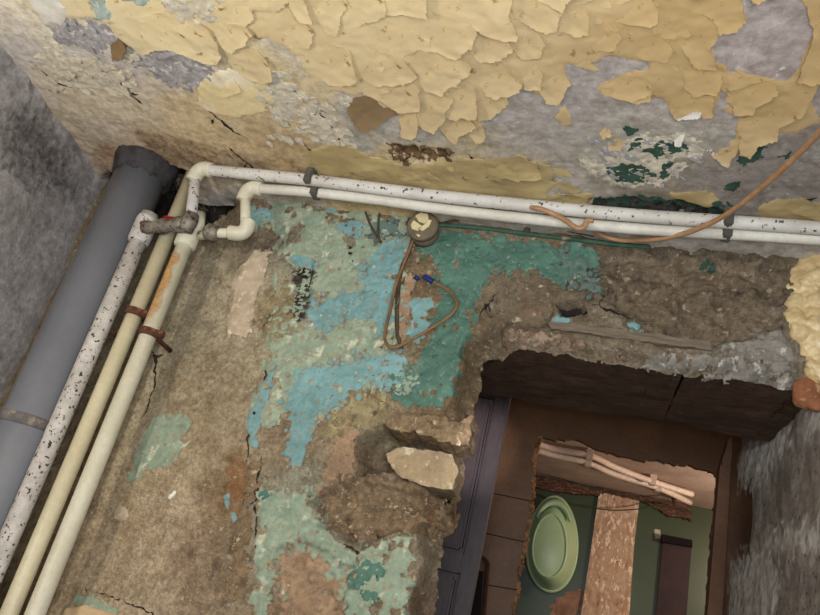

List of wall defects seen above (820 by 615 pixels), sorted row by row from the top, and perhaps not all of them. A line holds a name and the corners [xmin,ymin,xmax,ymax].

peeling [23,0,820,219]
hole [198,203,235,225]
peeling [758,198,820,221]
corrosion [148,255,179,315]
spalling [219,201,794,615]
peeling [125,405,193,483]
crack [85,588,154,615]